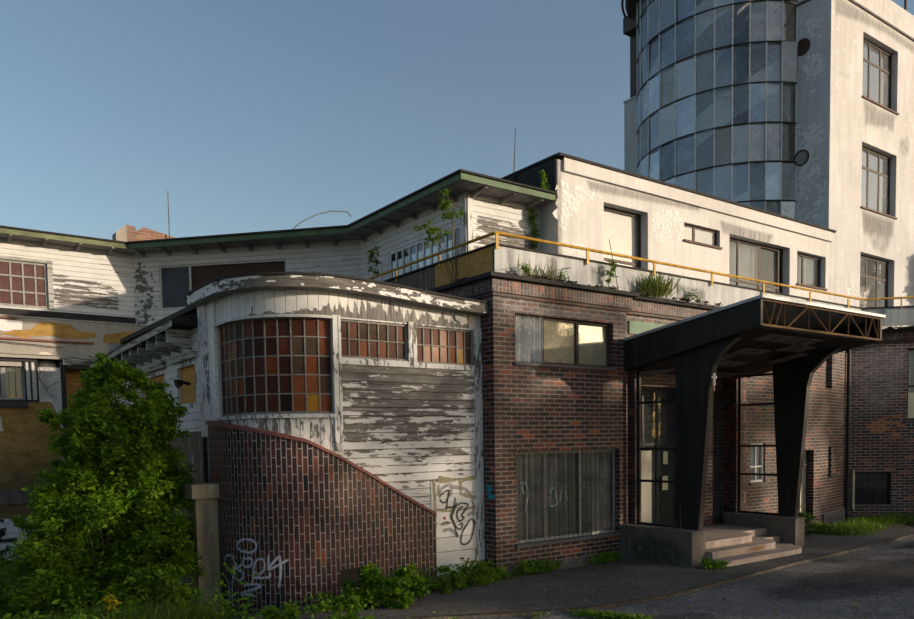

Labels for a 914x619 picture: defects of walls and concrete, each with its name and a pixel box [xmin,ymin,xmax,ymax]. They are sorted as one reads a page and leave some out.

peeling [794,121,827,225]
peeling [553,180,602,257]
spalling [0,262,157,345]
peeling [187,275,276,304]
peeling [248,275,486,328]
spalling [0,399,62,490]
peeling [223,364,476,529]